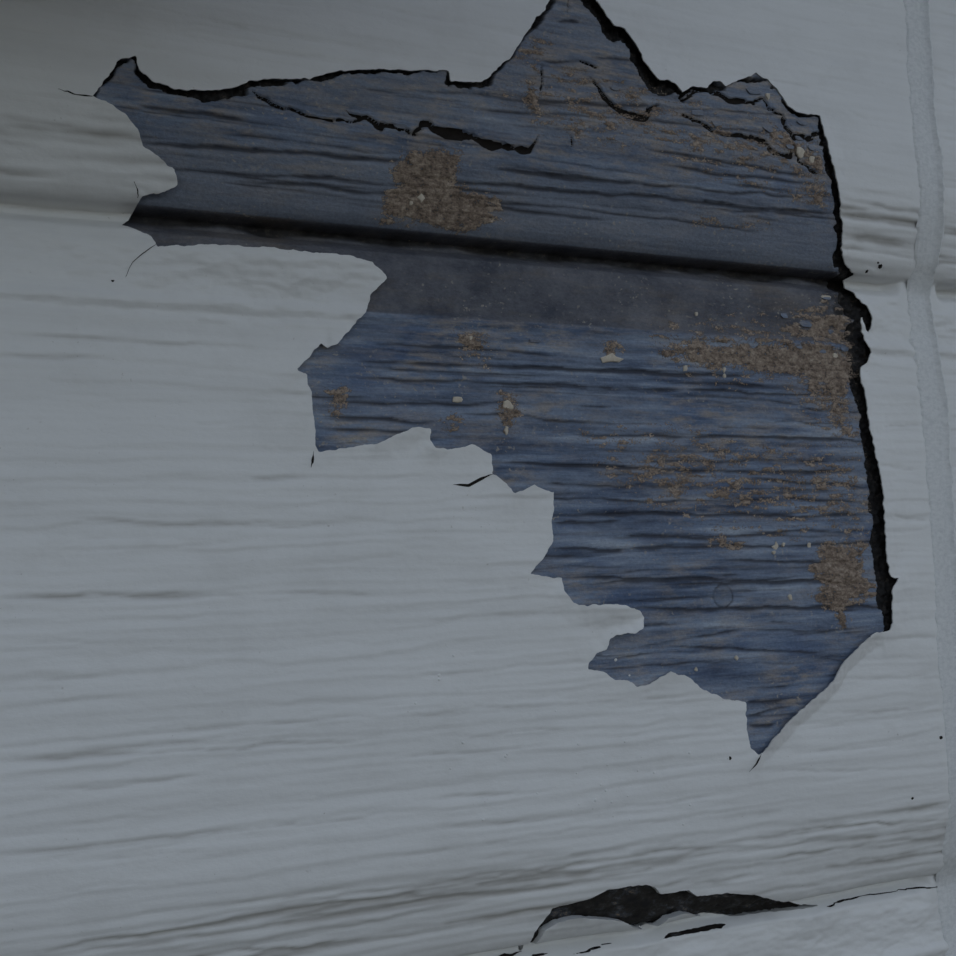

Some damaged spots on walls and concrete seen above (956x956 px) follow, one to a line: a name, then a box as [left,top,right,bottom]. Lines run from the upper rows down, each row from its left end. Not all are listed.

peeling [93,0,899,755]
crack [827,886,937,907]
crack [663,912,726,939]
crack [499,947,548,956]